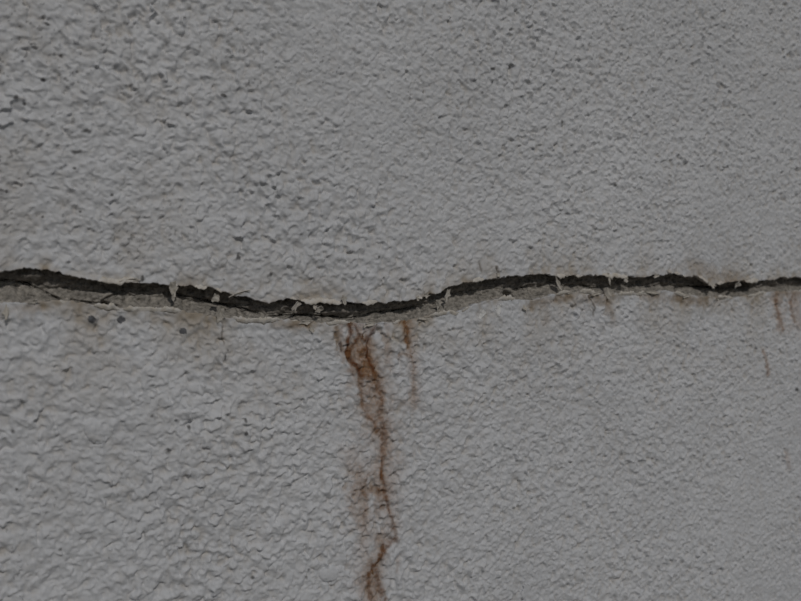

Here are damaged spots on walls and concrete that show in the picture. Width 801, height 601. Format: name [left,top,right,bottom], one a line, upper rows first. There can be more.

crack [0,267,801,333]
corrosion [345,323,383,404]